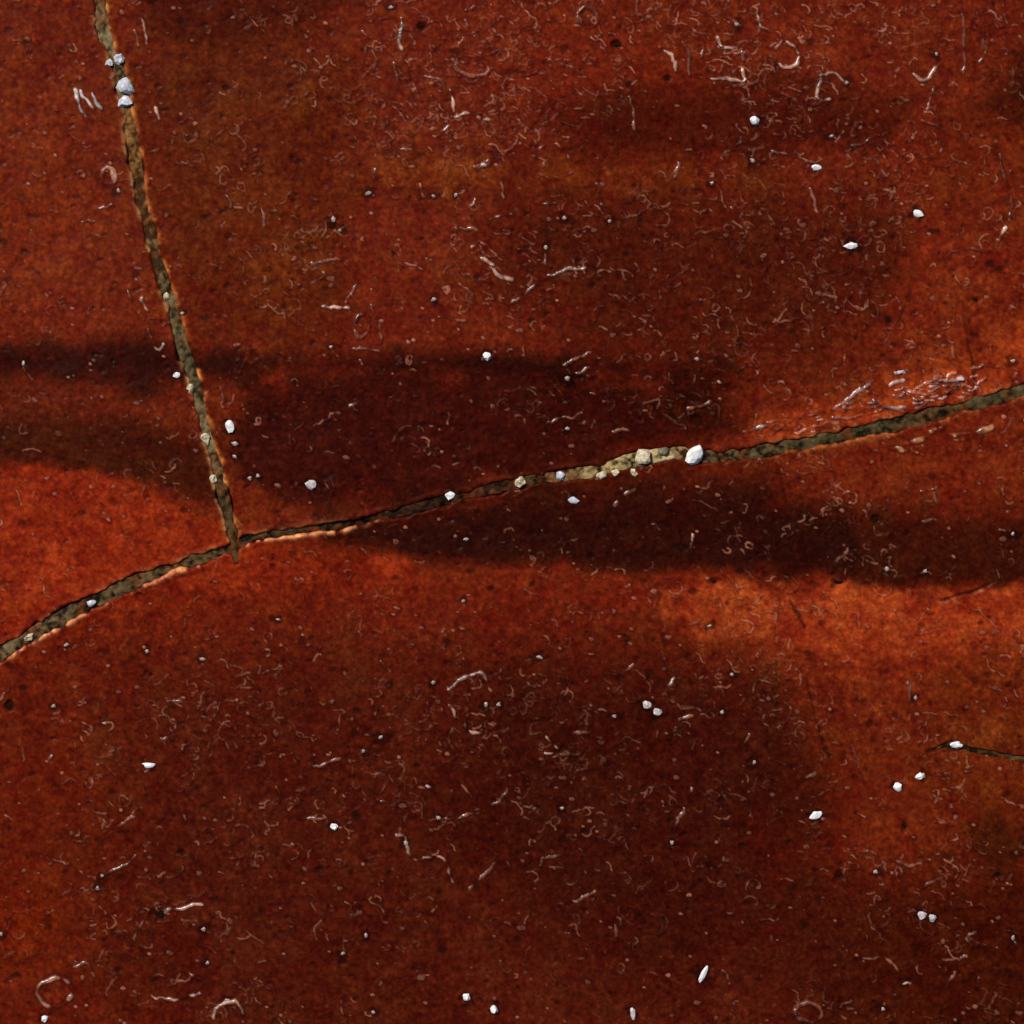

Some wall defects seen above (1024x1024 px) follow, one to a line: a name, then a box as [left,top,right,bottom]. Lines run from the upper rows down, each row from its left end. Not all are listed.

rust [163,25,337,345]
rust [338,155,709,200]
crack [0,0,1024,662]
rust [741,321,1024,443]
rust [0,465,417,665]
rust [657,577,1024,806]
rust [0,898,62,960]